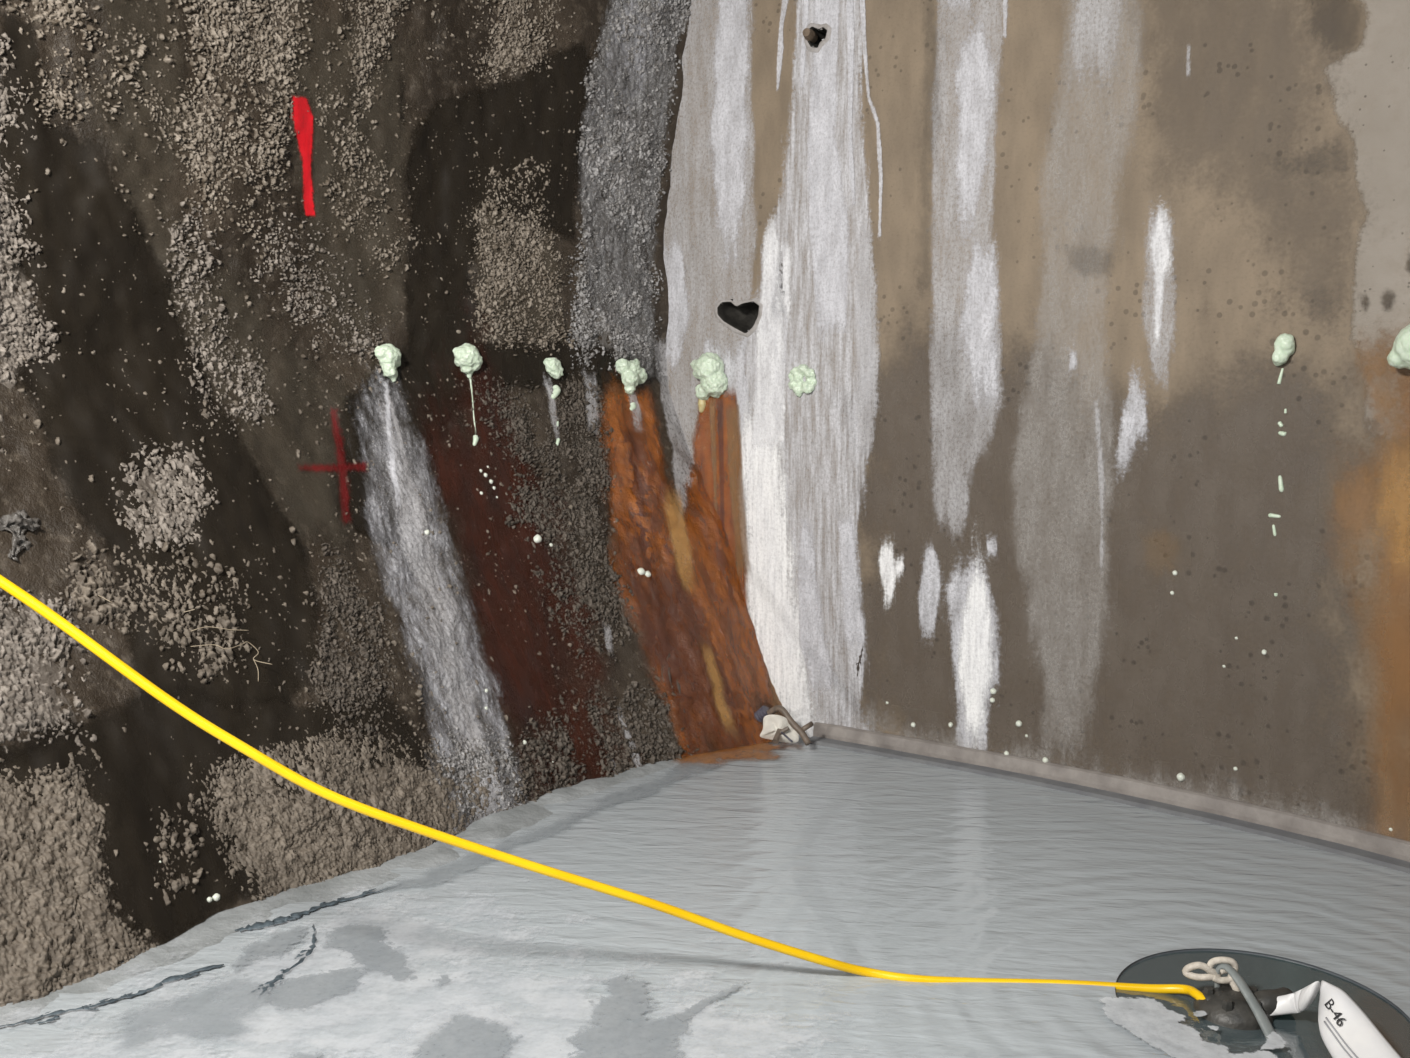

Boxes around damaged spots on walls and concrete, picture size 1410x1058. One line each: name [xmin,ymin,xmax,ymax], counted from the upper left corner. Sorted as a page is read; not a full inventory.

crack [0,964,224,1028]
leakage [0,688,304,941]
crack [235,884,401,1000]
corrosion [423,352,613,786]
corrosion [600,384,798,765]
leakage [0,0,1407,835]
corrosion [1337,427,1410,841]